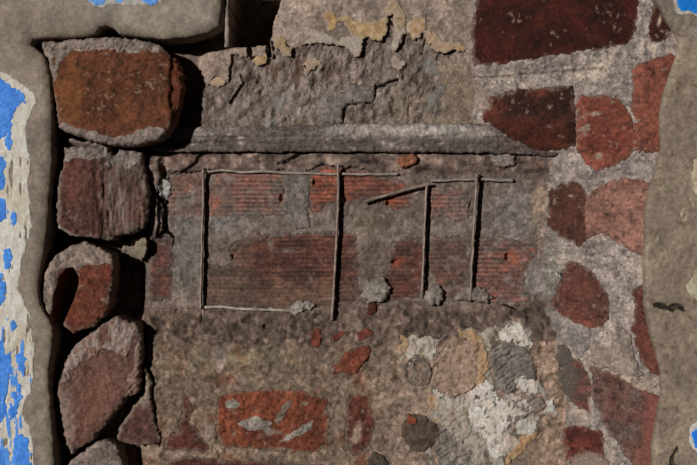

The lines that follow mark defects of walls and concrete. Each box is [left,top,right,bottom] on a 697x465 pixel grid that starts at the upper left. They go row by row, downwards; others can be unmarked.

flaking render [201,0,475,129]
crack [343,79,398,118]
peeling [0,72,37,465]